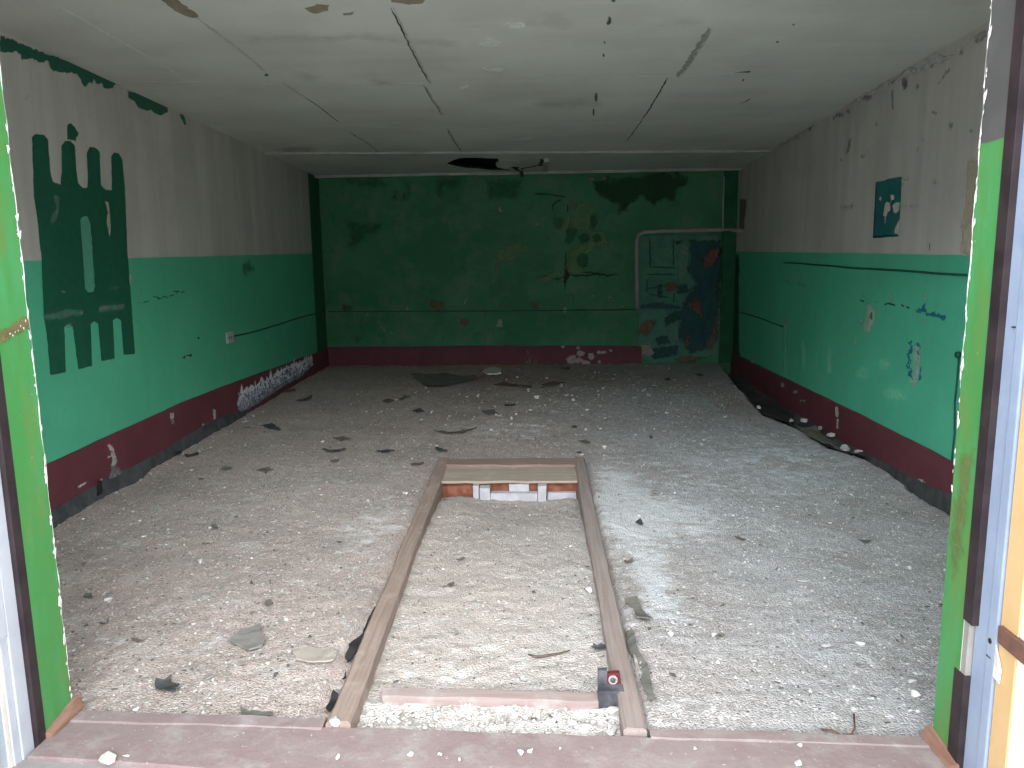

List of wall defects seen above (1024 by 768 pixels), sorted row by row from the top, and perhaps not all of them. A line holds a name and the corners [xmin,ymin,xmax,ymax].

peeling [0,36,116,89]
peeling [128,92,186,125]
crack [391,8,463,152]
crack [627,28,713,141]
crack [535,193,619,288]
corrosion [0,317,29,342]
leakage [237,355,313,412]
spalling [561,346,612,364]
spalling [906,340,922,387]